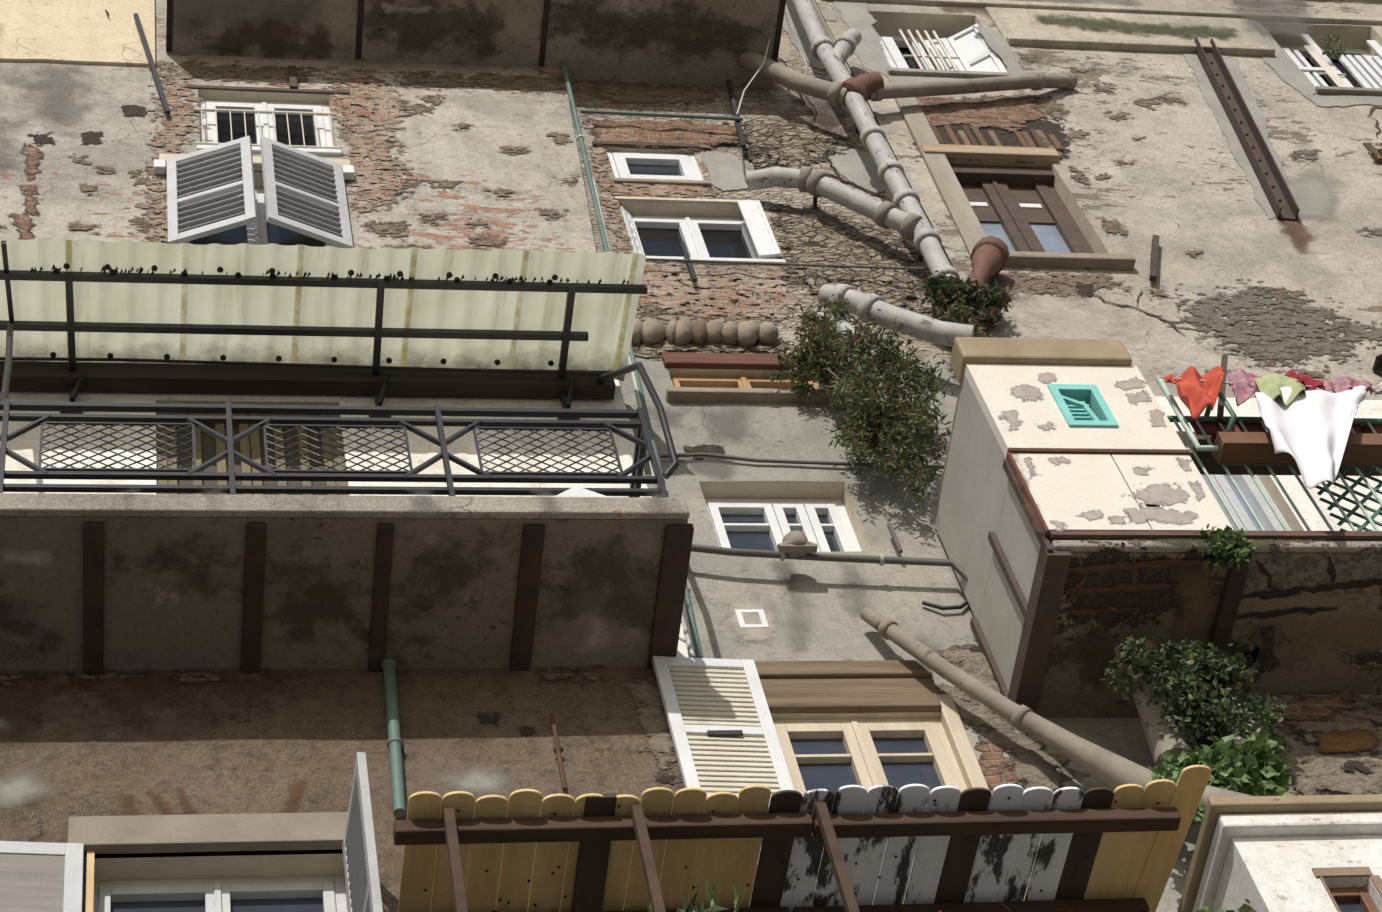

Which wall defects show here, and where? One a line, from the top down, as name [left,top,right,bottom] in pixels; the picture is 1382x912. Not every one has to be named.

leakage [178,0,334,58]
leakage [365,0,502,56]
leakage [550,0,758,57]
flaking render [0,59,740,254]
flaking render [636,261,802,328]
peeling [988,267,1382,380]
peeling [998,372,1057,431]
peeling [1114,377,1167,427]
peeling [1022,456,1071,476]
peeling [1050,457,1205,550]
flaking render [960,718,1028,790]
spalling [1270,690,1382,796]